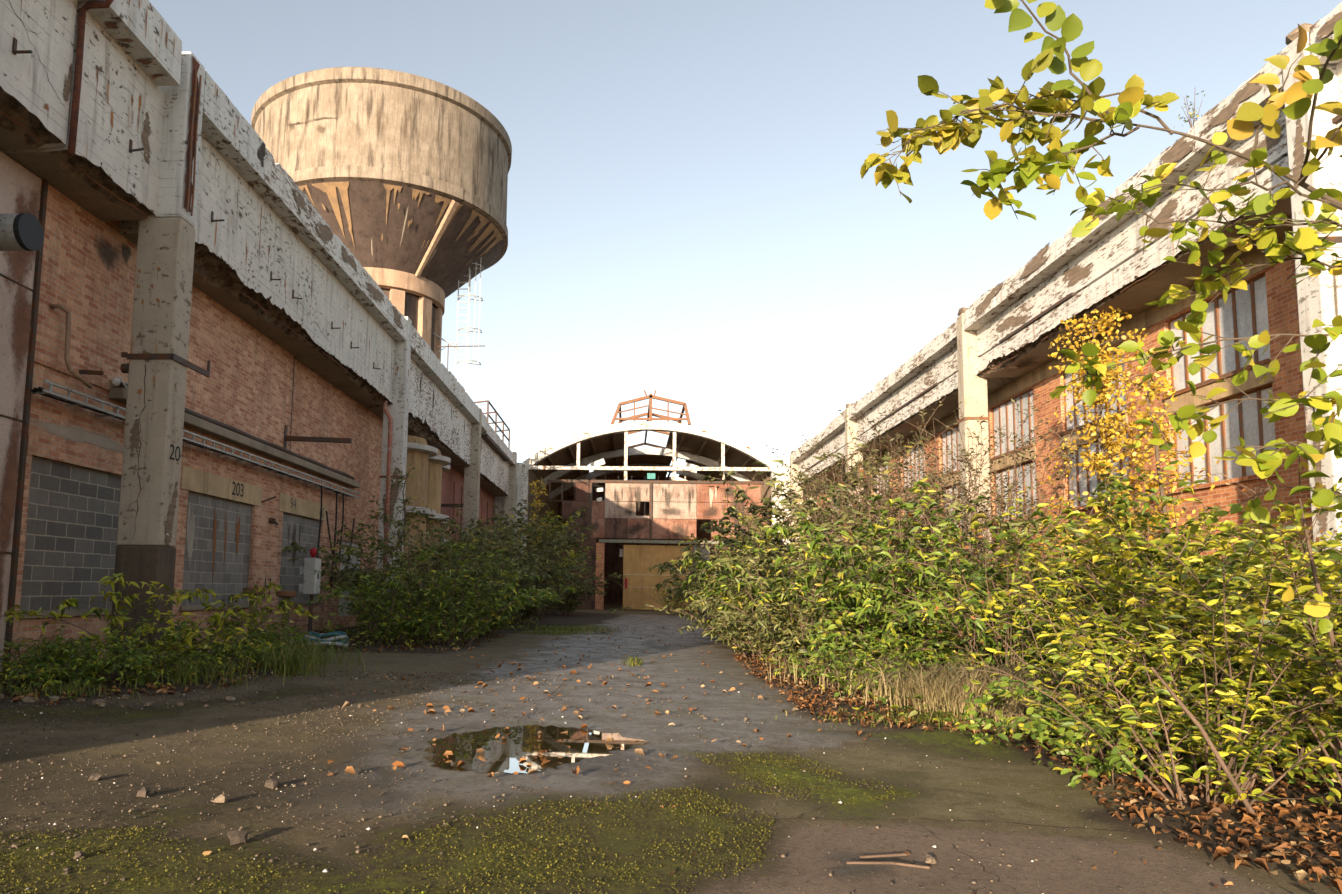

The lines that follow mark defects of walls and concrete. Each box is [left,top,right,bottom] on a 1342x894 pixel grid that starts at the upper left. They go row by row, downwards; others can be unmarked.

peeling [1315,12,1342,43]
peeling [63,64,73,101]
spalling [0,86,157,220]
peeling [258,142,266,167]
peeling [294,182,357,270]
rust [6,251,34,372]
peeling [367,283,403,329]
rust [0,415,21,614]